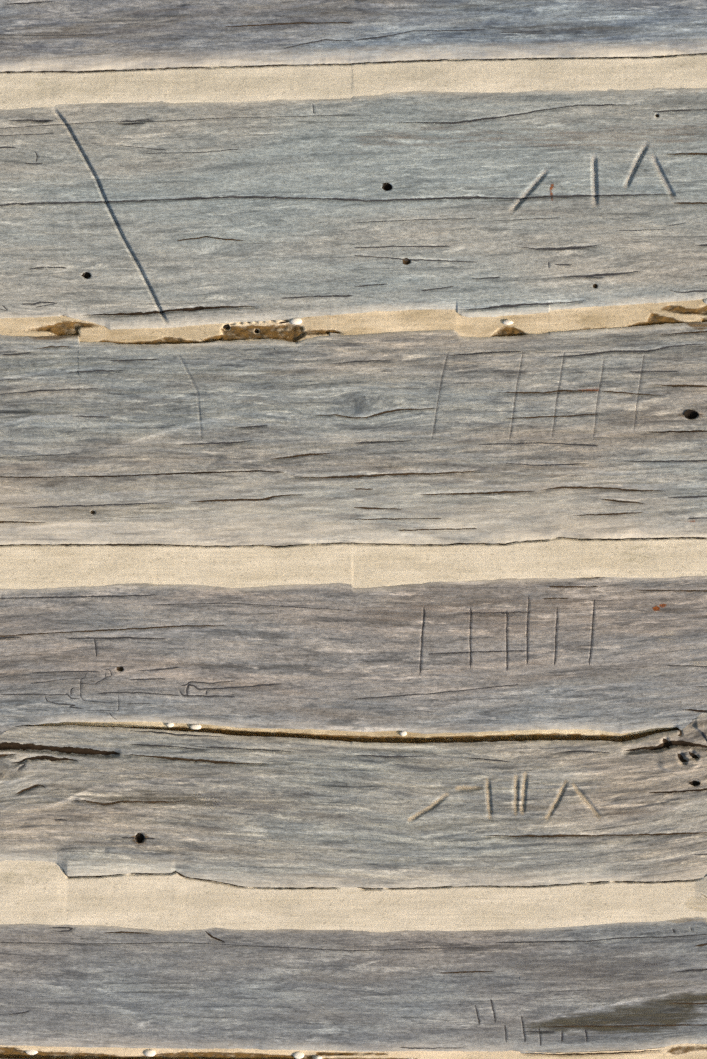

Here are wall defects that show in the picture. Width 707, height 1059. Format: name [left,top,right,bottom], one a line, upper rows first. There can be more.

spalling [628,305,707,327]
spalling [29,321,95,336]
spalling [100,325,341,345]
spalling [492,326,527,337]